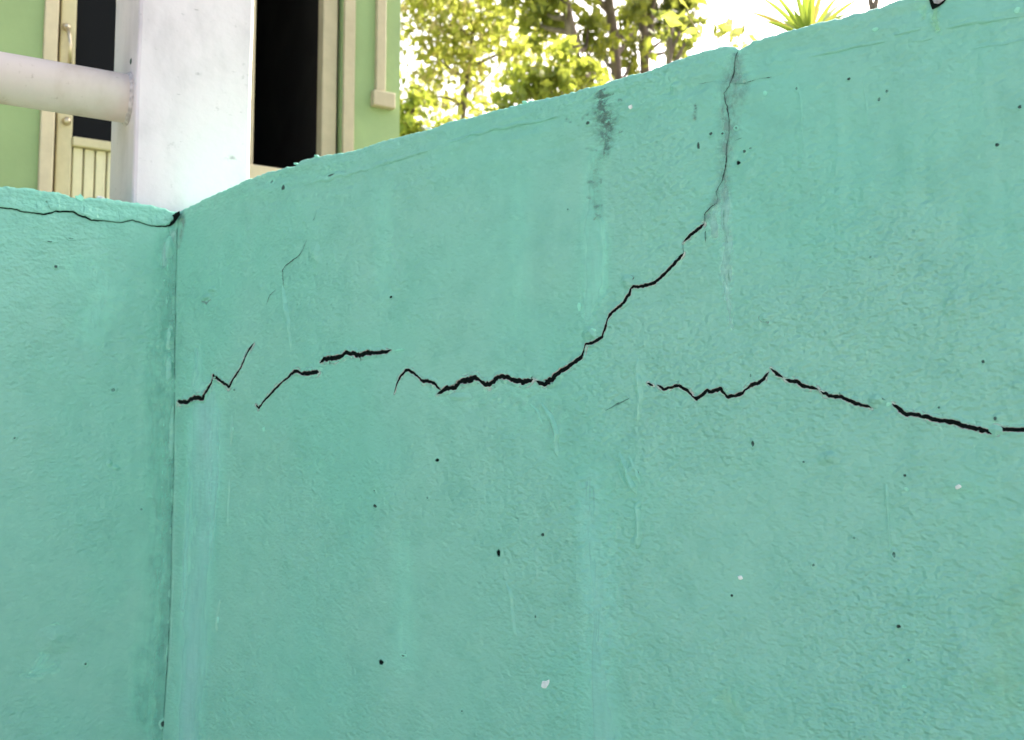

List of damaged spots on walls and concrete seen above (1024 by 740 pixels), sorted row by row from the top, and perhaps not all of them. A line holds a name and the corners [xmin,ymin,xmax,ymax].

crack [255,52,770,411]
crack [605,367,1024,438]